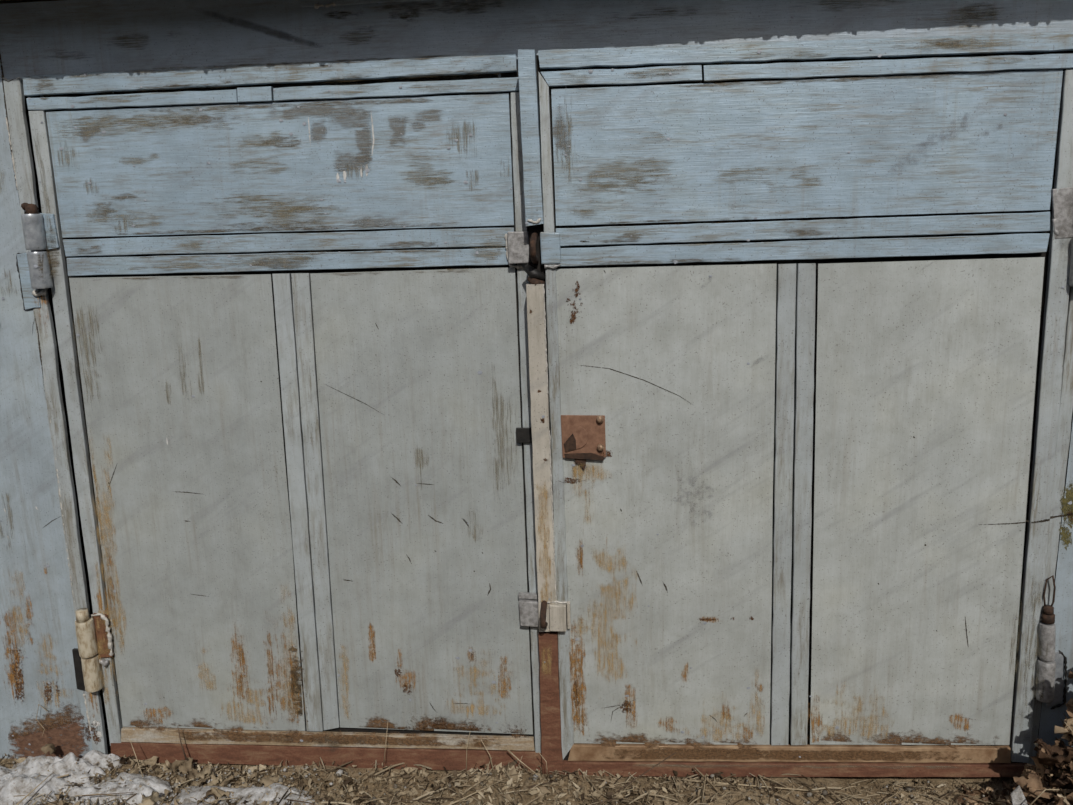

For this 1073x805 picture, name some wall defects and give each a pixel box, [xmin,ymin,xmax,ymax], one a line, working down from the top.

peeling [63,109,223,140]
peeling [243,86,372,171]
peeling [553,117,664,193]
corrosion [566,281,582,324]
corrosion [5,601,109,759]
corrosion [131,634,302,738]
corrosion [570,580,636,733]
corrosion [594,685,762,754]
corrosion [807,703,979,750]